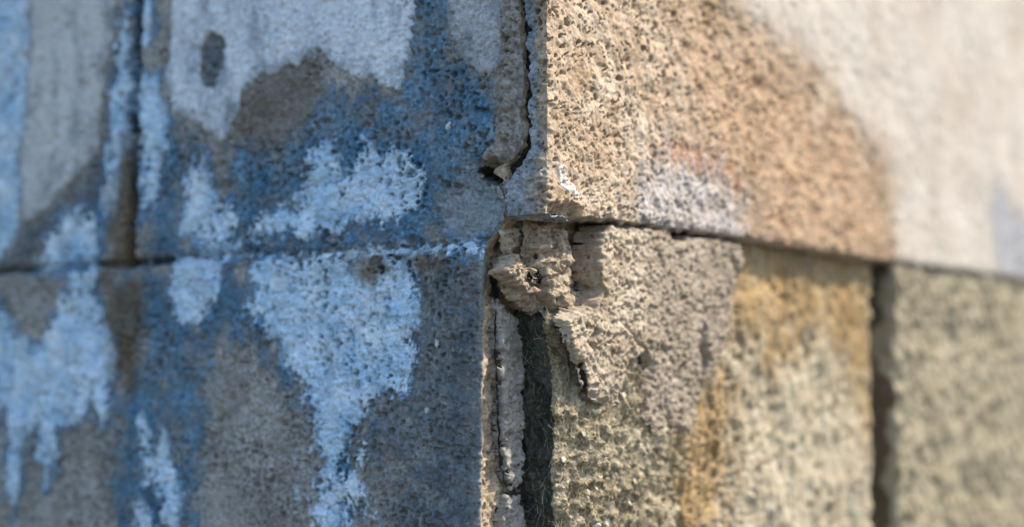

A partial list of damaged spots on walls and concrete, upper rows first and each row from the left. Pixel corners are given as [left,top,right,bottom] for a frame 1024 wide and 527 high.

crack [478,1,533,226]
damp [3,404,61,503]
damp [67,266,103,300]
damp [112,0,496,527]
crack [490,275,524,500]
spalling [488,219,586,319]